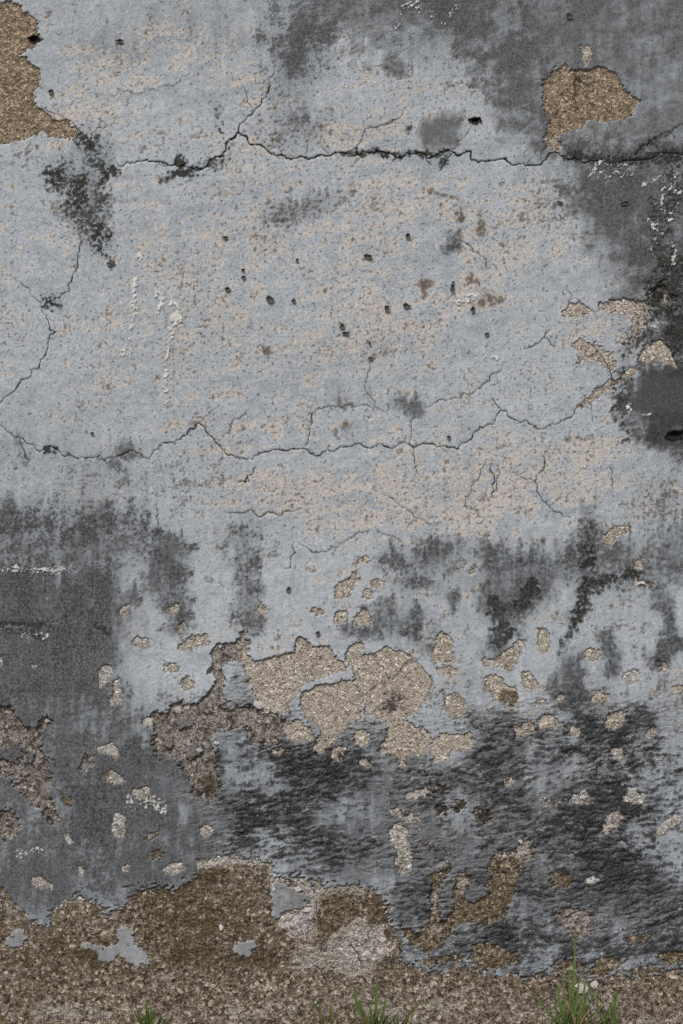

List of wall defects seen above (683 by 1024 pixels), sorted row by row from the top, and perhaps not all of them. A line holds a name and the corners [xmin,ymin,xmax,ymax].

flaking render [0,0,76,144]
crack [42,75,188,153]
crack [118,70,683,171]
flaking render [541,45,641,151]
mould [42,130,121,270]
damp [253,0,683,462]
crack [0,229,620,518]
damp [341,533,460,651]
flaking render [142,603,474,802]
damp [546,517,683,824]
flaking render [388,784,492,875]
flaking render [0,831,683,1024]